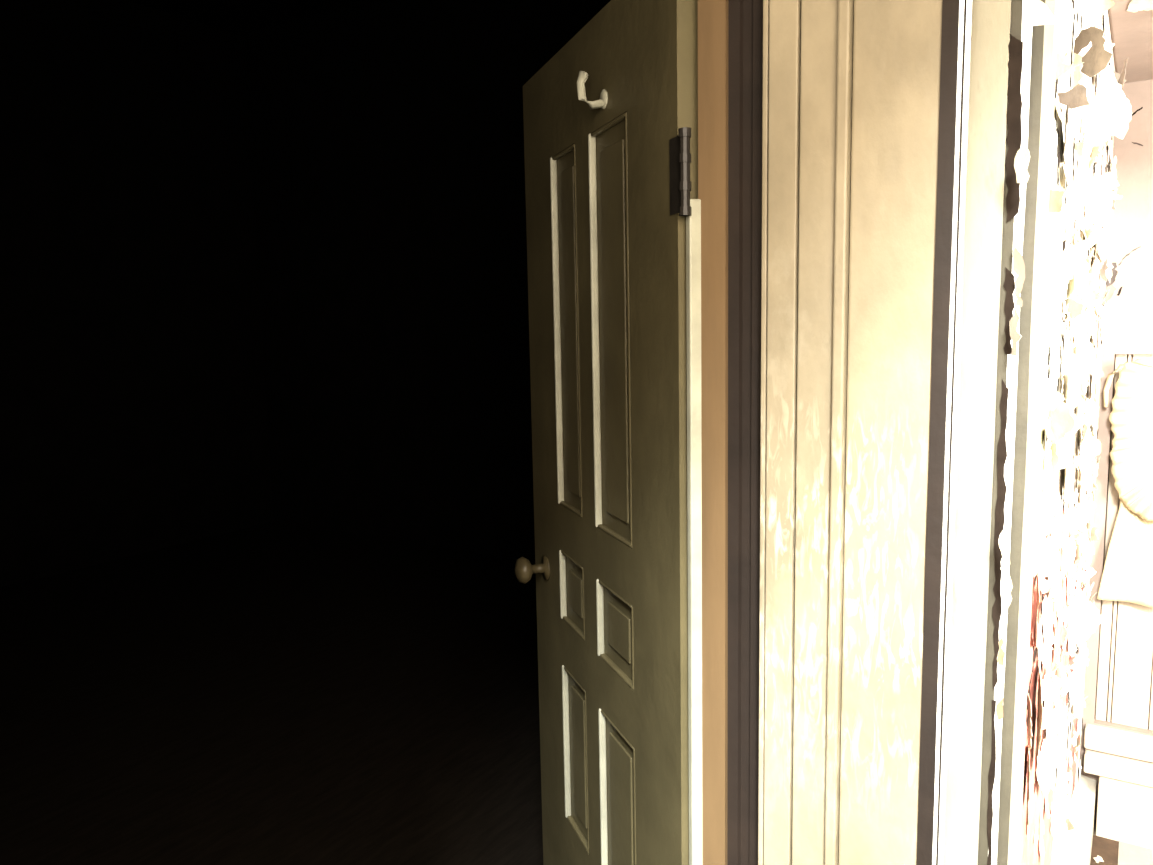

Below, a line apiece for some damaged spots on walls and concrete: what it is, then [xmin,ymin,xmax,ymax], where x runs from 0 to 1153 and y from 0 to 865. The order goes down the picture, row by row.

peeling [987,380,1013,865]
peeling [1003,247,1025,355]
peeling [1005,34,1030,223]
peeling [1026,0,1153,865]